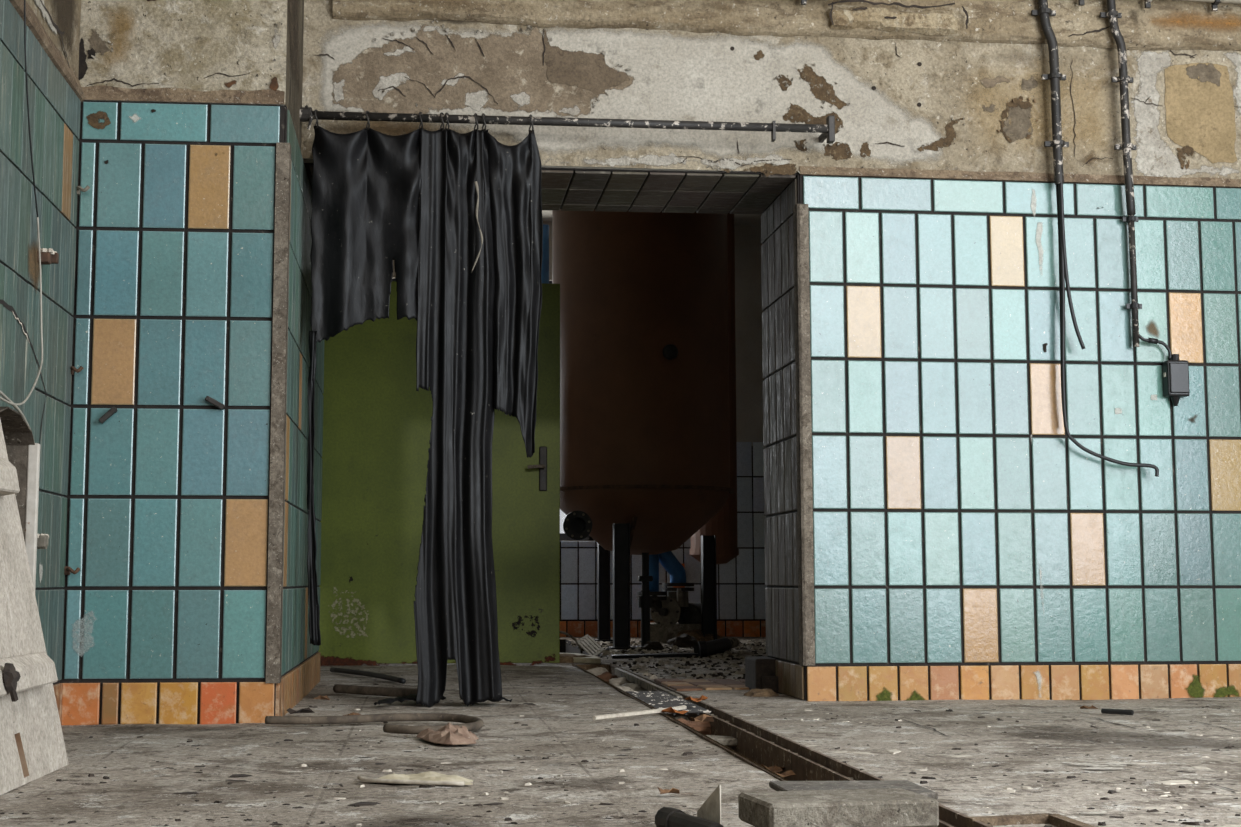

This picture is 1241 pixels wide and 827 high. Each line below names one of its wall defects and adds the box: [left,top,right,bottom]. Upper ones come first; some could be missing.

peeling [332,20,634,117]
peeling [706,139,808,177]
peeling [774,63,871,161]
peeling [917,117,965,152]
spalling [980,75,1038,143]
spalling [1177,145,1194,169]